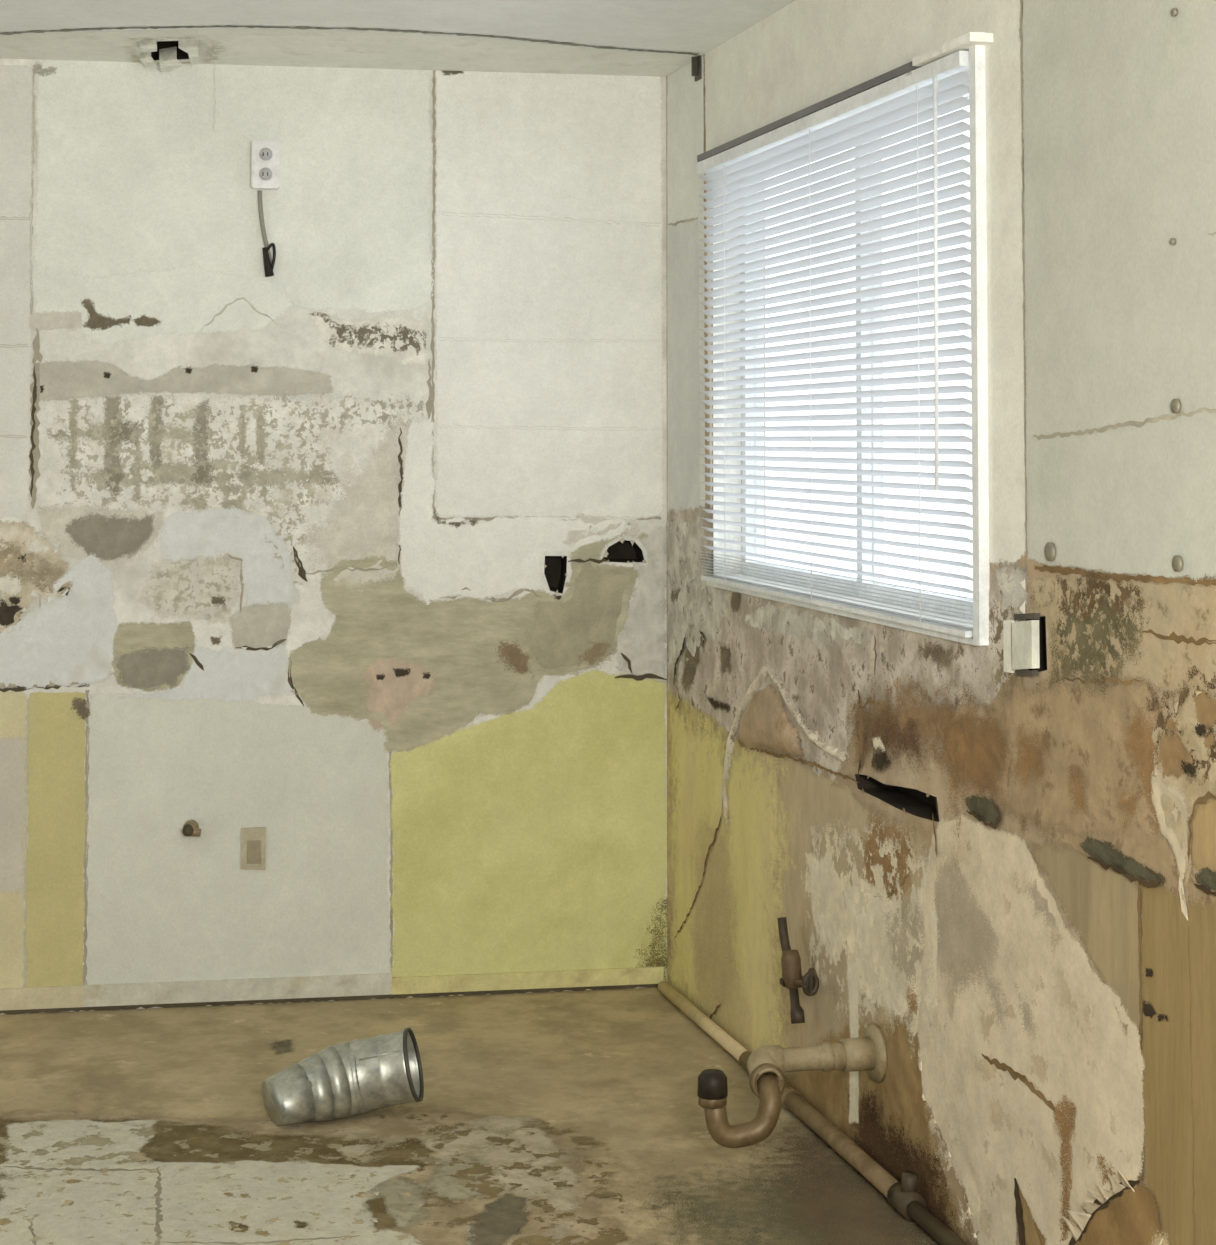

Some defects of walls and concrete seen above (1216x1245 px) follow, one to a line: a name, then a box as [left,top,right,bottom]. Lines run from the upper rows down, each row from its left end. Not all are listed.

peeling [29,298,162,331]
peeling [31,356,335,401]
crack [1020,0,1216,586]
peeling [0,505,166,634]
peeling [109,620,204,693]
damp [1044,569,1150,701]
crack [1062,677,1143,686]
crack [1143,629,1216,645]
peeling [227,409,1216,1245]
crack [1136,881,1144,1109]
damp [608,1112,940,1245]
damp [845,1076,960,1236]